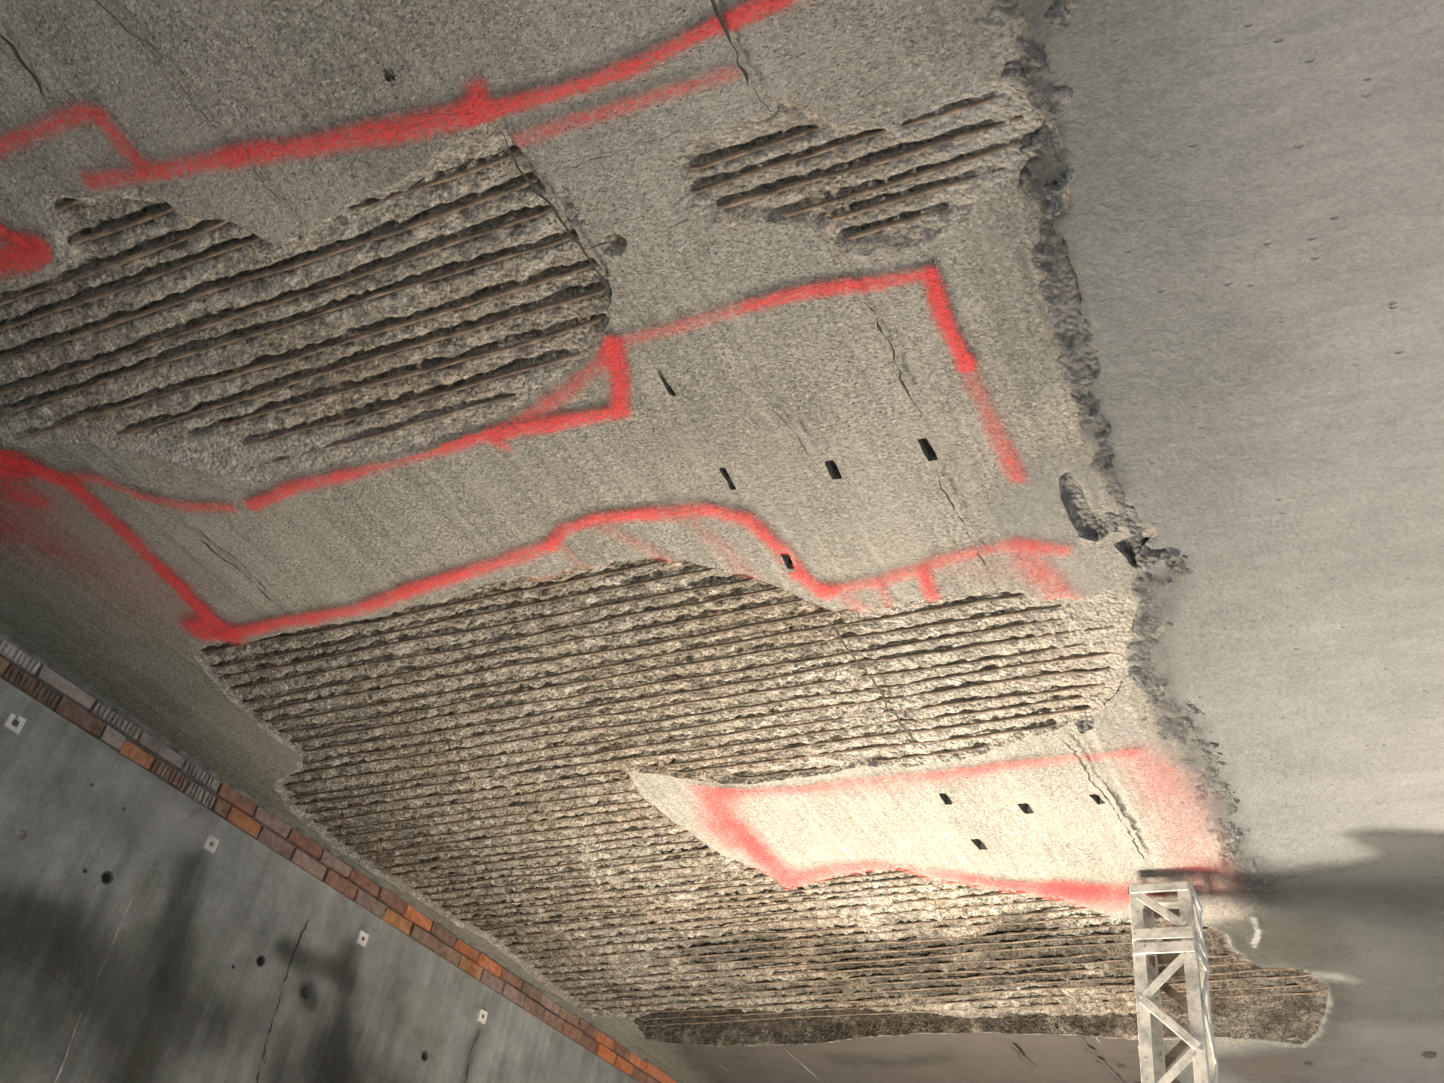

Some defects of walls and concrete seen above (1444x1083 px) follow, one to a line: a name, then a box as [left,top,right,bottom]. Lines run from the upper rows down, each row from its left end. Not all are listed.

crack [0,34,59,120]
crack [711,0,775,112]
spalling [677,81,1052,256]
spalling [0,121,628,486]
spalling [1058,471,1151,569]
spalling [194,558,1139,1046]
crack [1060,737,1146,861]
spalling [1154,918,1182,942]
spalling [1158,964,1190,1038]
spalling [1203,926,1329,1045]
damp [1215,833,1444,1083]